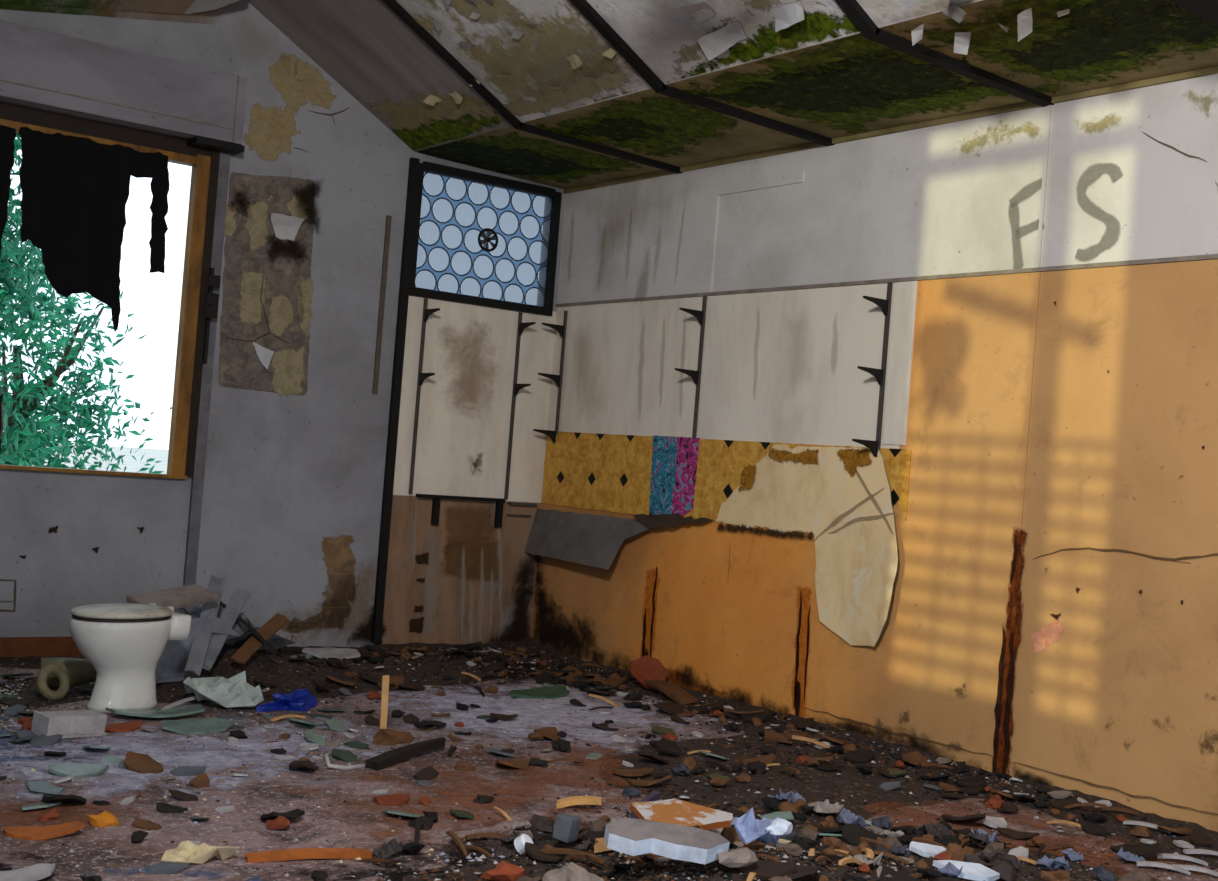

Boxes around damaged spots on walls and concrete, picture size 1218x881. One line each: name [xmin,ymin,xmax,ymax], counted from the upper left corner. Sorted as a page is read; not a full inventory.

leakage [413,0,629,103]
peeling [244,53,337,161]
leakage [1083,116,1118,132]
crack [1142,132,1218,187]
peeling [219,172,320,398]
peeling [281,535,358,638]
leakage [445,508,499,580]
rust [641,566,659,657]
rust [792,588,811,718]
peeling [716,444,899,647]
rust [992,528,1027,773]
crack [1034,547,1218,564]